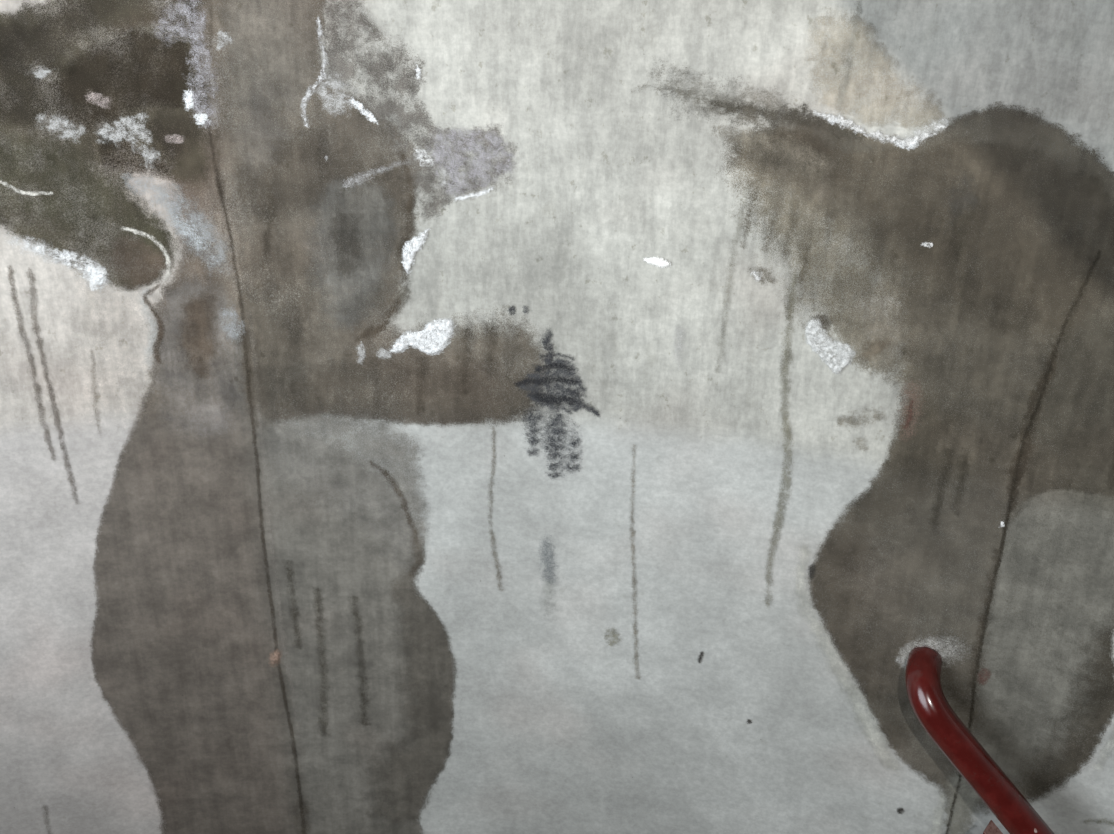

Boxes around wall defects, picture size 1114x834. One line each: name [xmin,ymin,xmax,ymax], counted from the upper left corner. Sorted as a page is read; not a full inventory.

peeling [121,227,172,369]
crack [190,0,312,834]
damp [5,0,563,834]
peeling [356,319,456,364]
peeling [396,228,431,305]
spalling [805,298,913,380]
damp [714,0,1114,815]